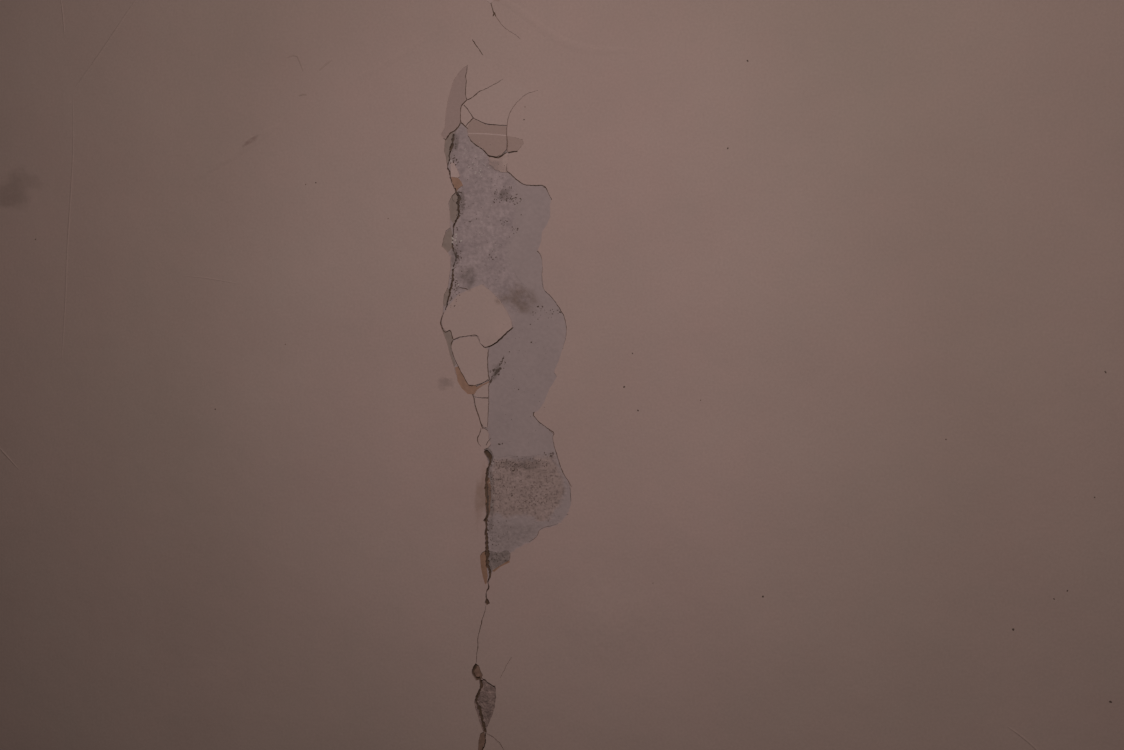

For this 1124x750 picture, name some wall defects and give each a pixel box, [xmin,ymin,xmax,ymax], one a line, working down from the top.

crack [445,41,525,308]
peeling [440,46,571,584]
crack [473,396,494,662]
spalling [472,664,496,750]
crack [483,734,504,750]